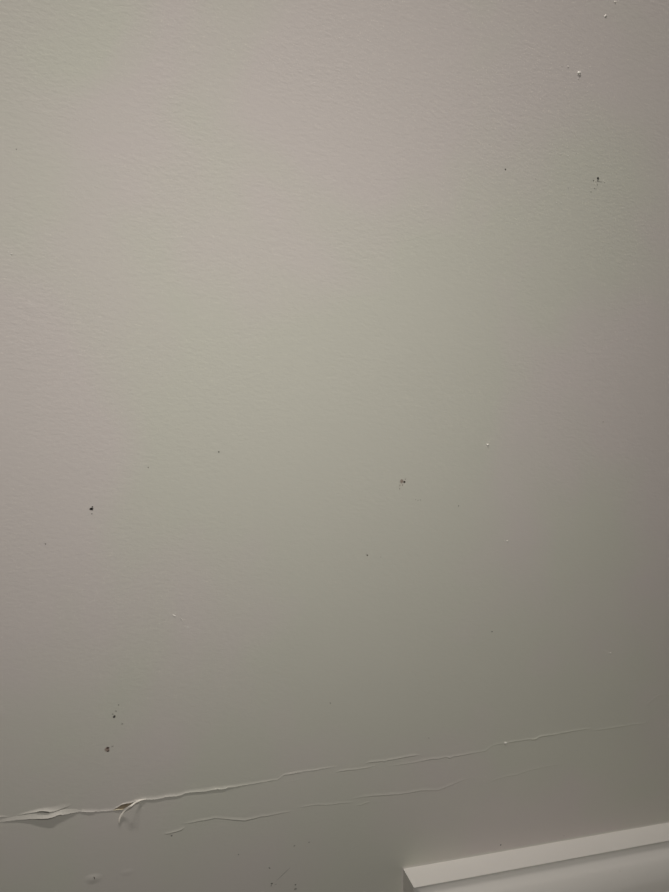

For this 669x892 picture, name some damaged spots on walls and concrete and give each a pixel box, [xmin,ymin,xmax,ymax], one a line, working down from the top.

crack [0,716,669,823]